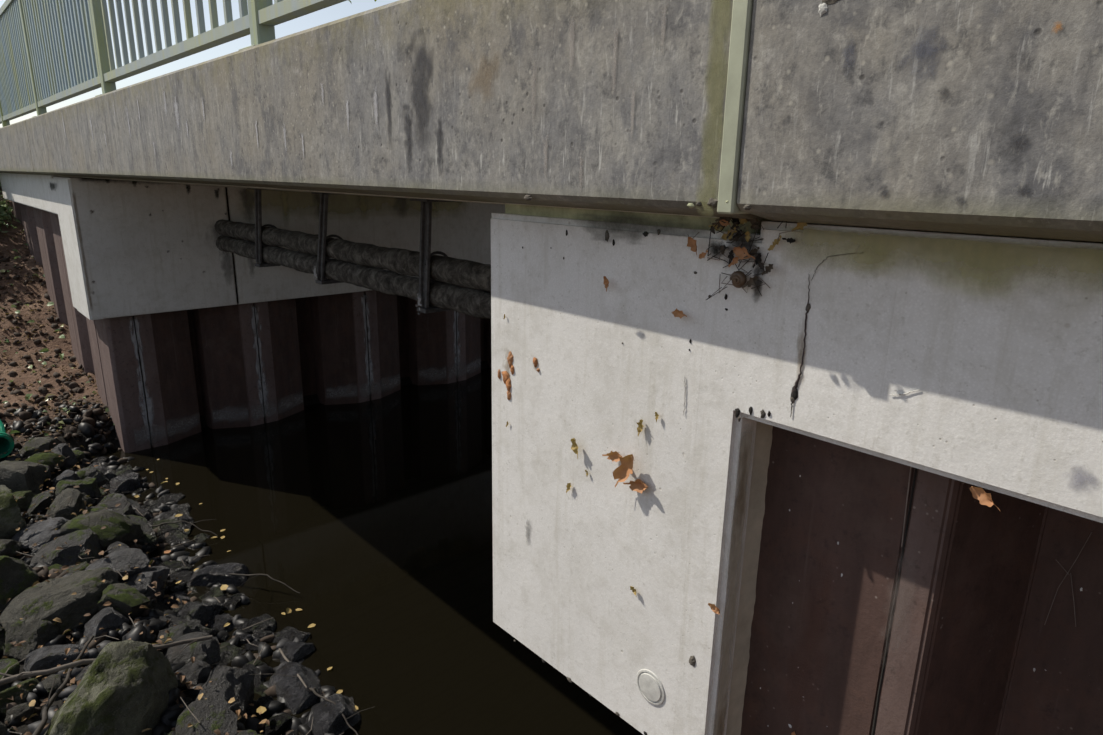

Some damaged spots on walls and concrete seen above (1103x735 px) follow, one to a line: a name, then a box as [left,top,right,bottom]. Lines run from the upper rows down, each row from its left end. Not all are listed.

leakage [374,83,391,130]
leakage [403,44,431,153]
leakage [130,316,199,447]
leakage [213,303,303,422]
crack [790,252,863,417]